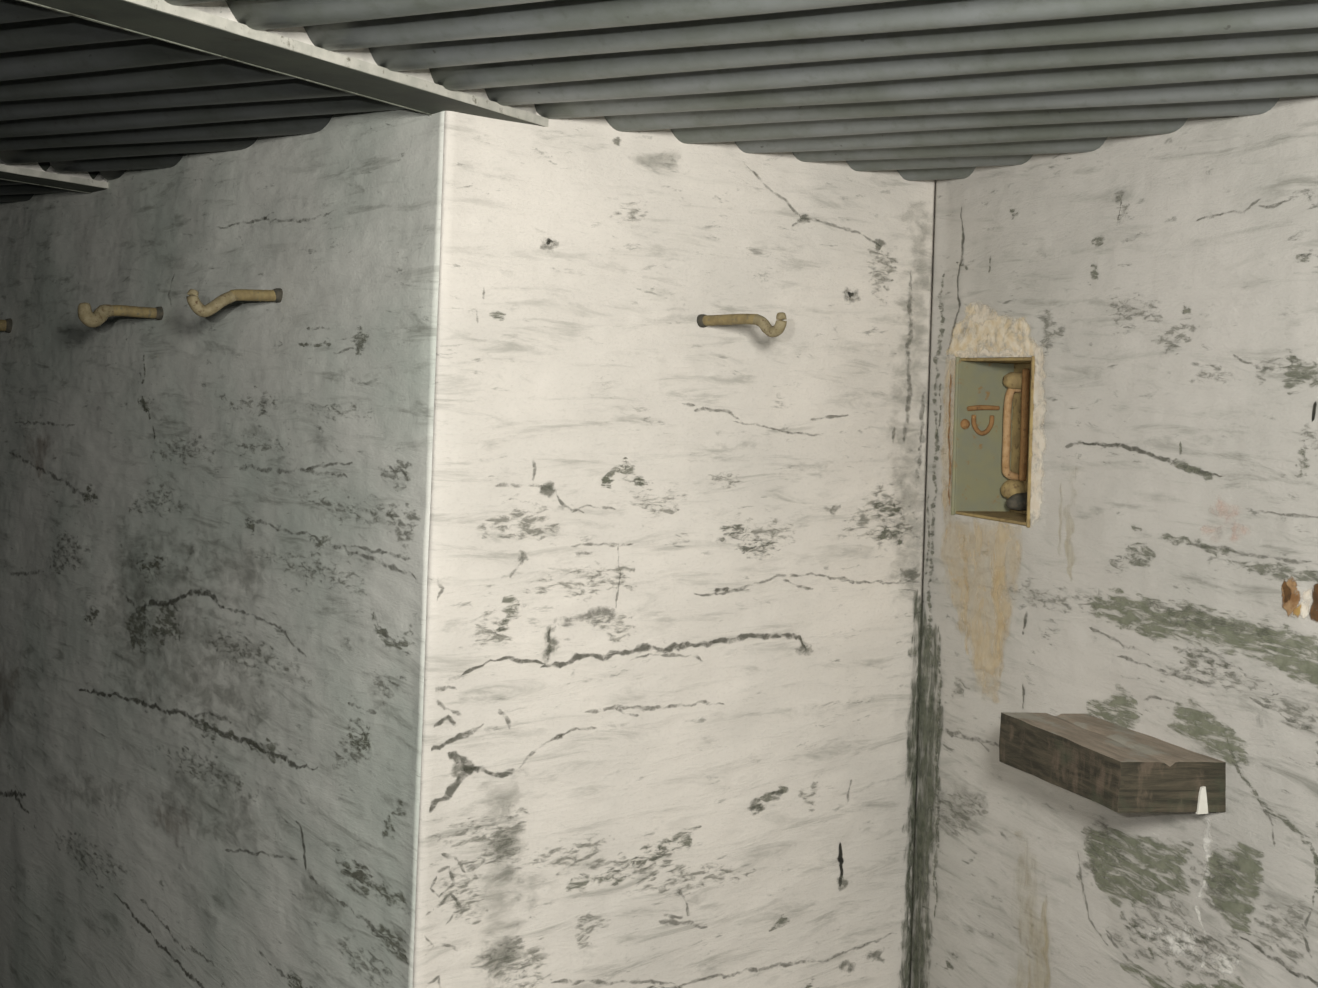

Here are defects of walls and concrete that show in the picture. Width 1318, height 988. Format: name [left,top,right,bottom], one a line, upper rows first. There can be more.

crack [853,231,885,250]
damp [957,348,1022,358]
crack [126,590,300,651]
crack [462,630,809,675]
damp [892,274,952,988]
rust [1281,576,1318,622]
damp [1154,819,1239,974]